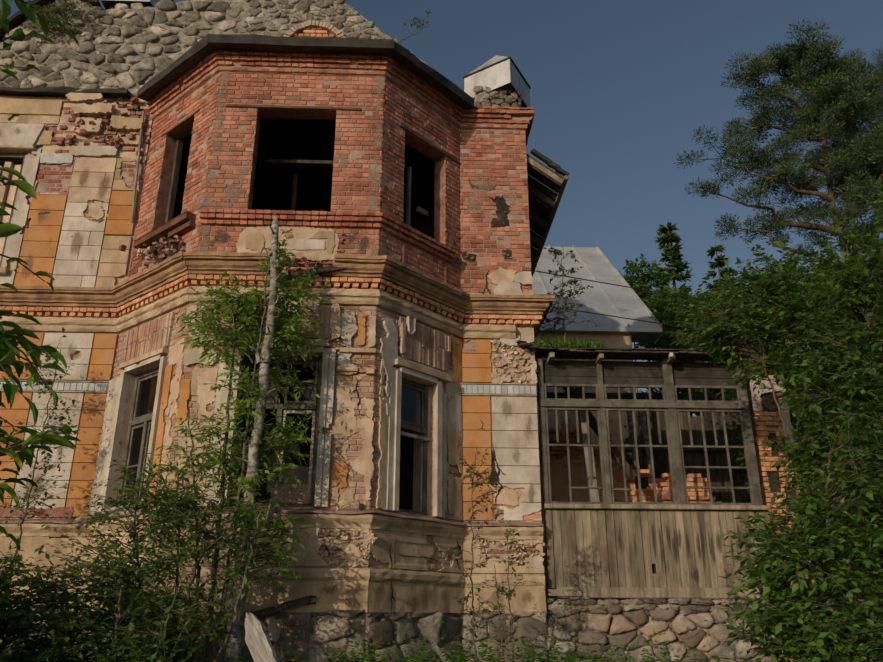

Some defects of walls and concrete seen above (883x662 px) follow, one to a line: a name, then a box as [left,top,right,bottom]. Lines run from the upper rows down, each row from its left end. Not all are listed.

flaking render [31,89,153,198]
flaking render [84,200,109,223]
spalling [468,178,511,228]
peeling [237,226,347,262]
peeling [487,249,533,295]
peeling [330,304,416,510]
crack [480,420,506,505]
flaking render [489,484,542,527]
flaking render [317,528,378,568]
crack [389,543,435,608]